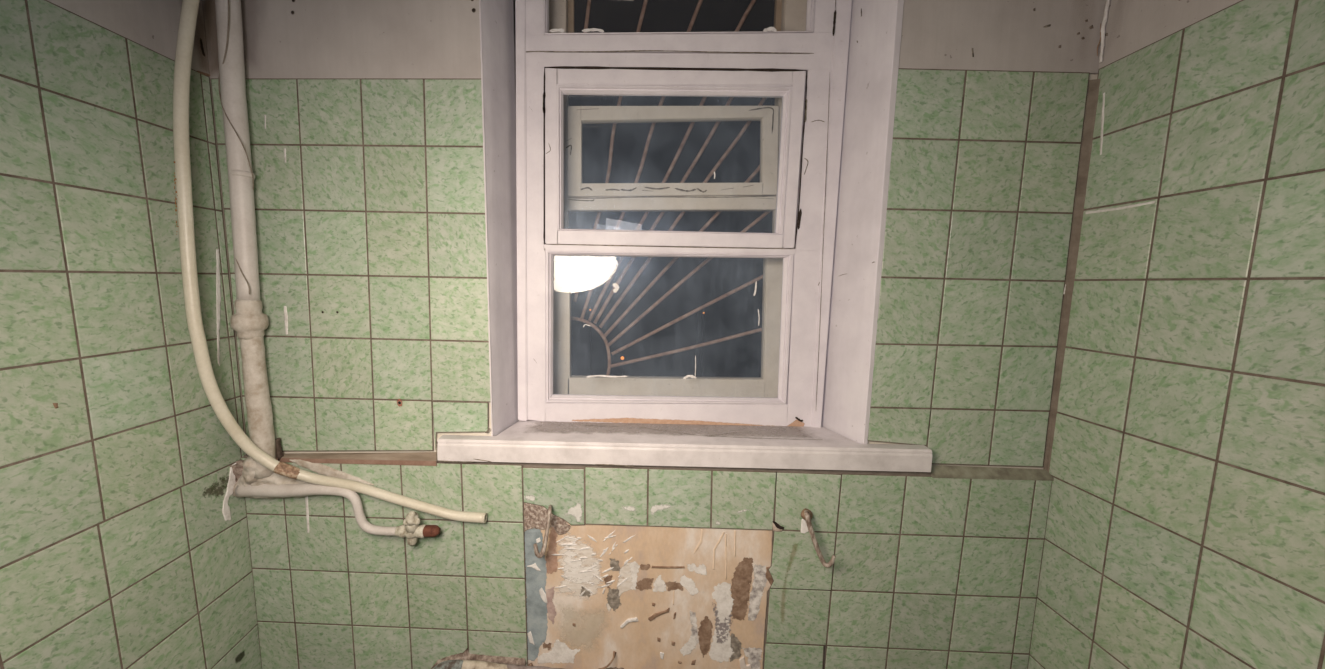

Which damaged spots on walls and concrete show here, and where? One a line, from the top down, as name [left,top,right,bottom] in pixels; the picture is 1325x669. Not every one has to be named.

flaking render [524,503,784,669]